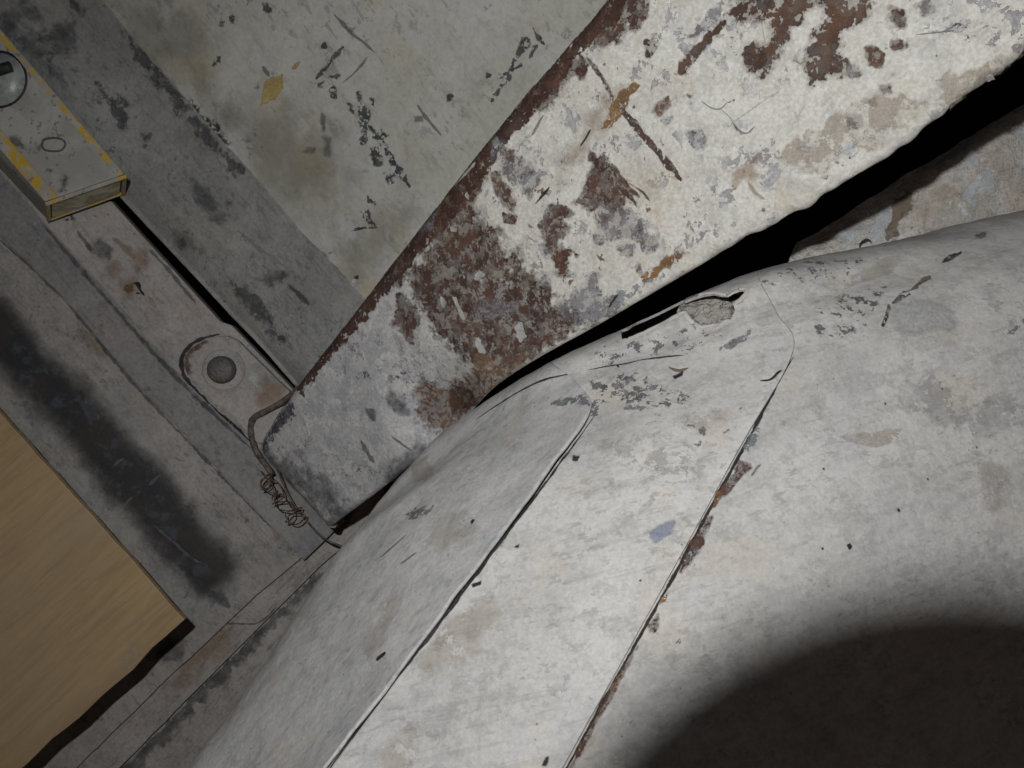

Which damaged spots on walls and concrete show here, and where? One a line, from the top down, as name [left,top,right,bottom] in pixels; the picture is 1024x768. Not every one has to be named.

corrosion [678,0,908,87]
corrosion [918,0,933,16]
corrosion [385,145,579,432]
peeling [590,372,689,416]
corrosion [680,461,751,572]